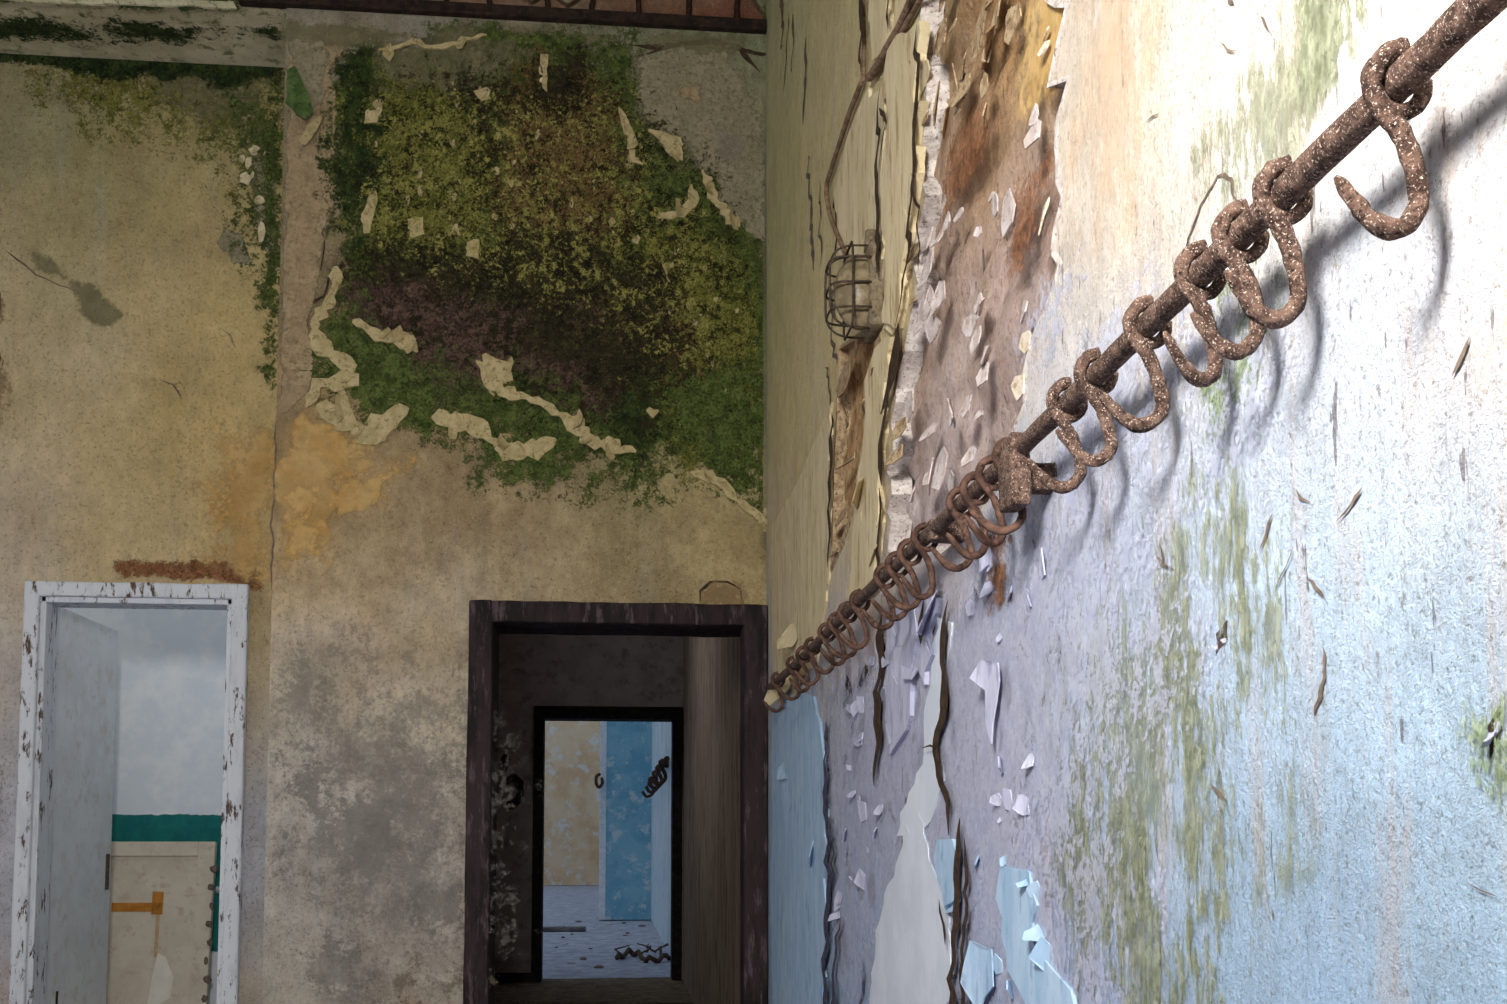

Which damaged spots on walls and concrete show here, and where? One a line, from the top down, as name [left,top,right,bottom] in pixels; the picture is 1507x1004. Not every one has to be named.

spalling [7,0,237,10]
spalling [433,0,766,19]
water stain [32,252,123,326]
water stain [300,19,764,516]
spalling [690,0,1078,1004]
water stain [1182,458,1237,536]
corrosion [988,534,1013,612]
water stain [1055,647,1225,1004]